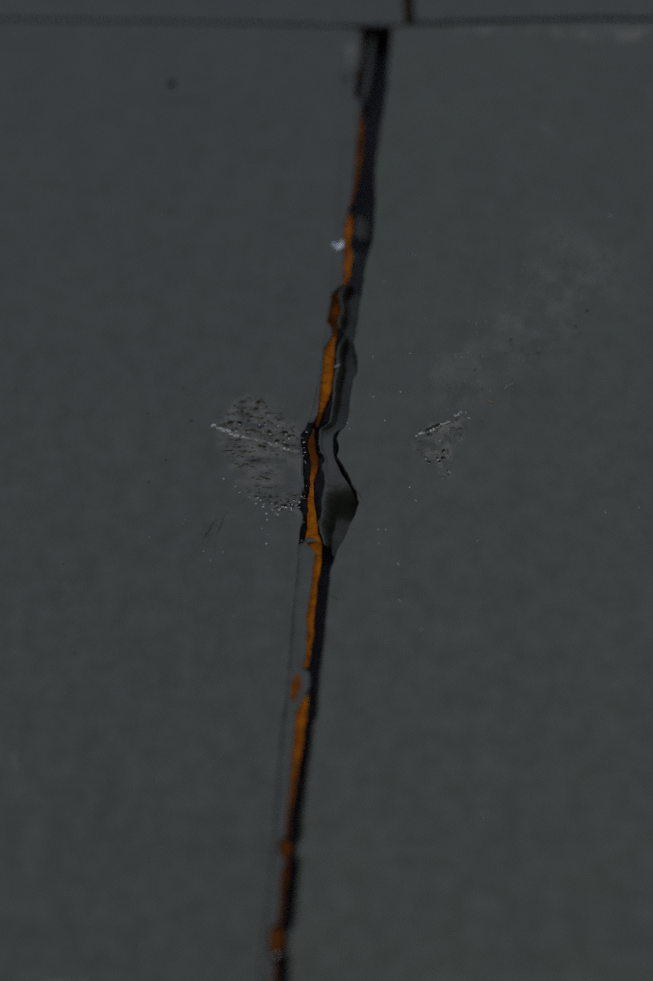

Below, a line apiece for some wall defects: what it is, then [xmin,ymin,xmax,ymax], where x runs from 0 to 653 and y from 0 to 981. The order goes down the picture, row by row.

spalling [211,388,308,528]
crack [259,27,376,981]
spalling [410,398,476,485]